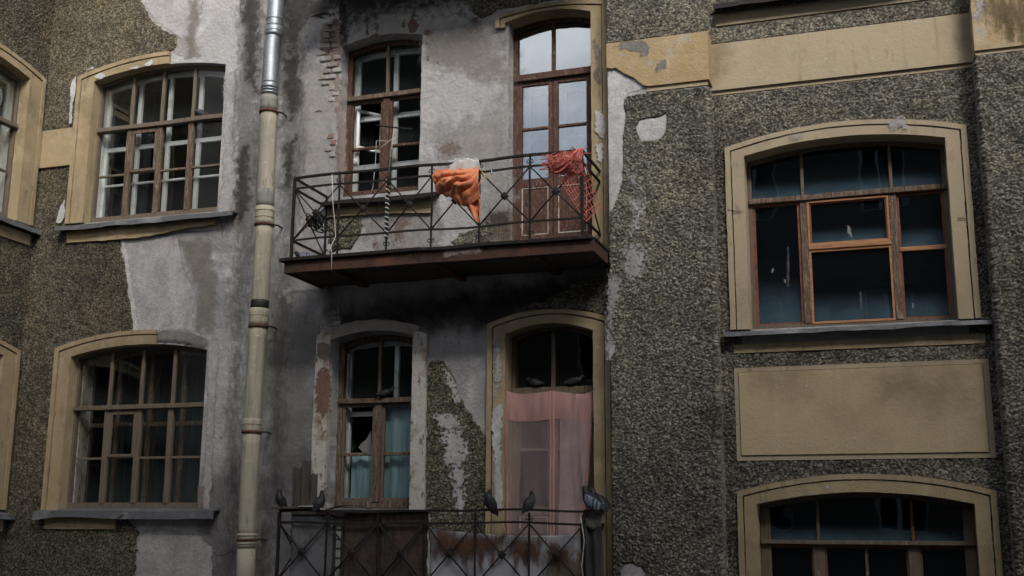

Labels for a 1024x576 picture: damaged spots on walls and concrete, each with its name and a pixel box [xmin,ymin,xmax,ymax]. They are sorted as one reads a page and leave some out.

flaking render [145,0,208,62]
damp [241,0,261,92]
peeling [217,68,238,238]
damp [235,146,251,220]
damp [283,138,297,186]
peeling [287,18,347,225]
flaking render [593,37,667,212]
flaking render [121,234,220,509]
flaking render [314,342,332,419]
peeling [431,364,472,515]
flaking render [135,528,214,576]
rust [342,512,567,576]